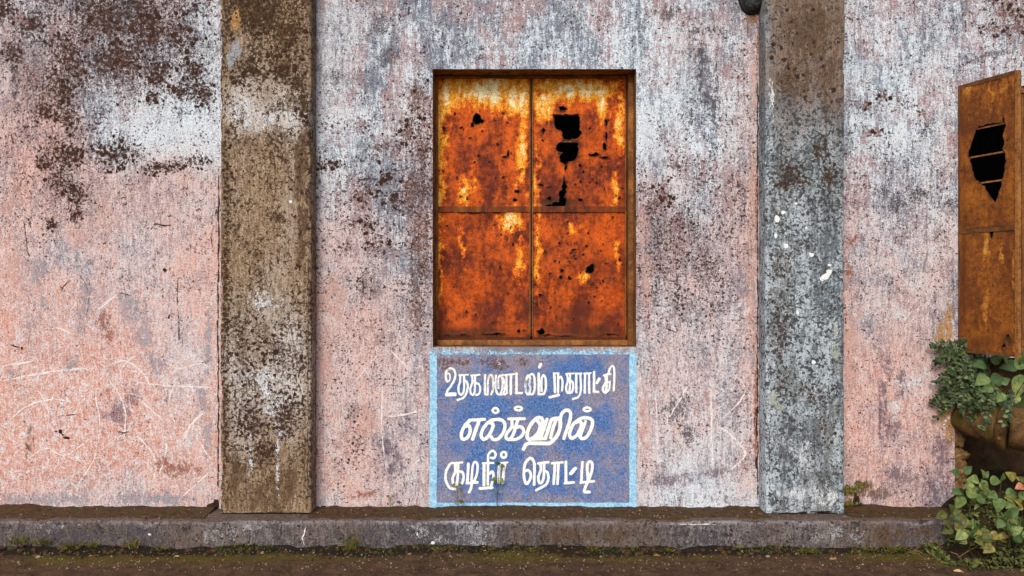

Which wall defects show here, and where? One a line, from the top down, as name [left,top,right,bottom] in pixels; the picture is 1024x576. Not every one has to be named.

leakage [770,0,841,122]
leakage [773,135,838,194]
leakage [0,0,346,512]
leakage [754,248,838,470]
leakage [776,486,840,511]